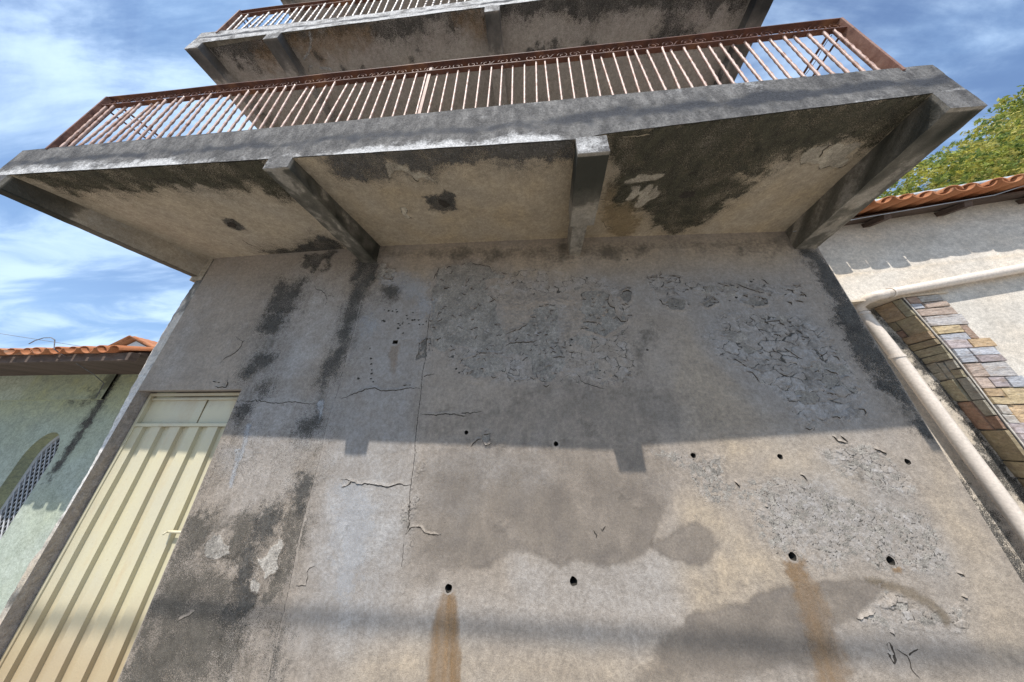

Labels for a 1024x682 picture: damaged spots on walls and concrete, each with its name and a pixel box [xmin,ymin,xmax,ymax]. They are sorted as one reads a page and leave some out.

leakage [16,160,303,213]
leakage [296,140,575,213]
leakage [601,94,930,235]
leakage [245,227,345,336]
leakage [120,466,317,682]
leakage [230,351,281,486]
leakage [291,259,403,448]
crack [213,289,482,681]
spalling [455,351,528,386]
leakage [439,471,715,567]
peeling [641,279,973,664]
crack [897,644,921,677]